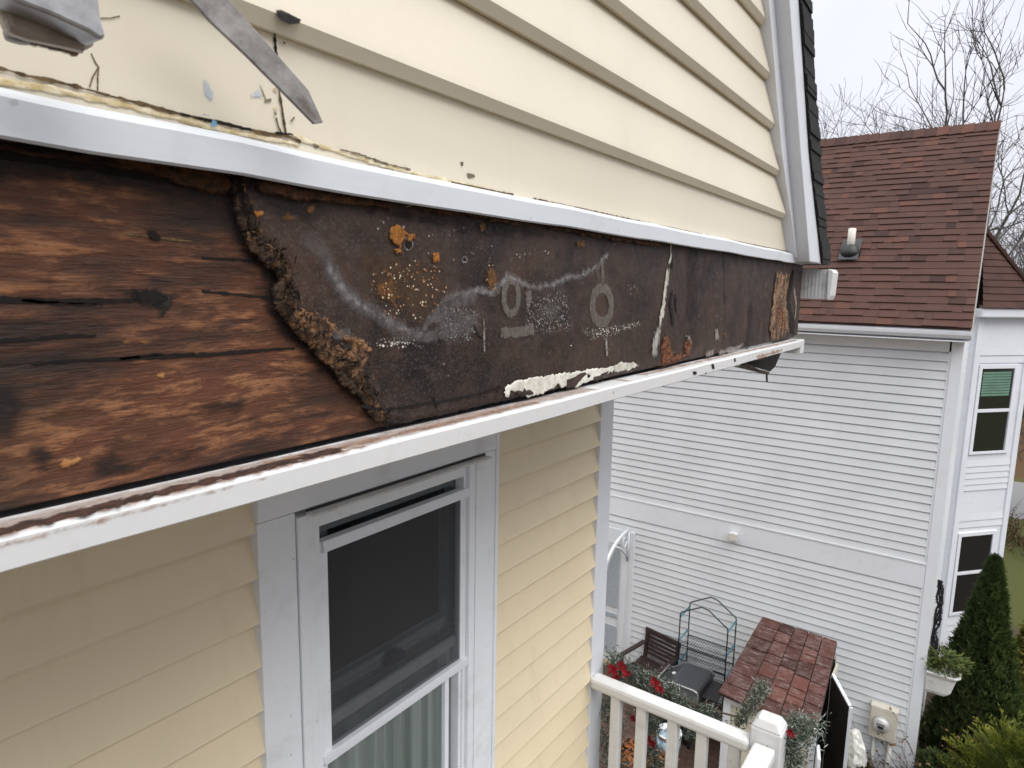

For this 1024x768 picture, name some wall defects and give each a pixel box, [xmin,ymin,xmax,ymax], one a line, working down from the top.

rust [372,224,447,322]
crack [0,296,139,306]
peeling [231,174,395,428]
crack [0,333,295,365]
peeling [504,362,637,398]
peeling [60,457,82,468]